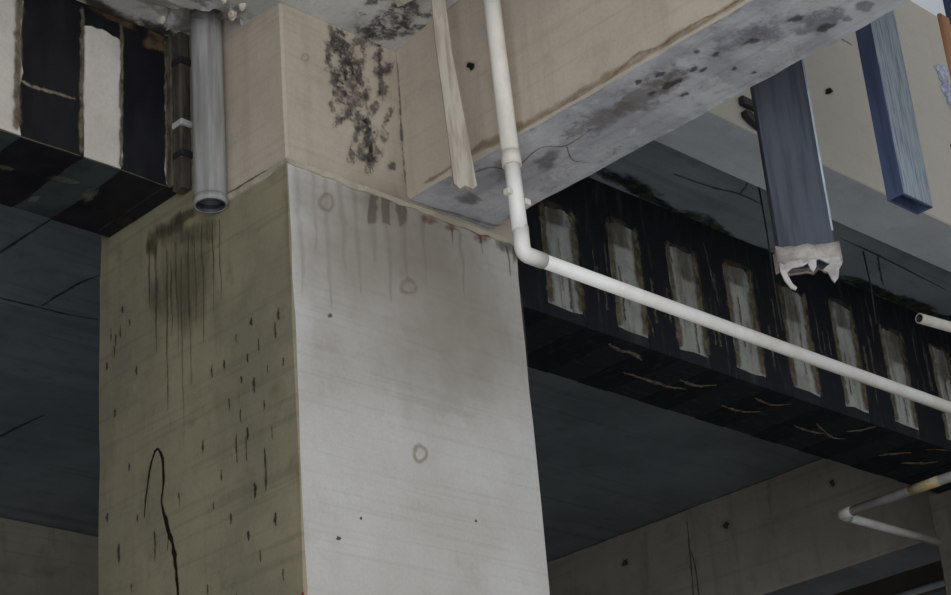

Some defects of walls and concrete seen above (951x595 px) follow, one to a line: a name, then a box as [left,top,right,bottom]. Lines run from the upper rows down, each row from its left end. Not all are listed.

damp [325,0,433,176]
damp [148,210,222,392]
crack [144,448,179,595]